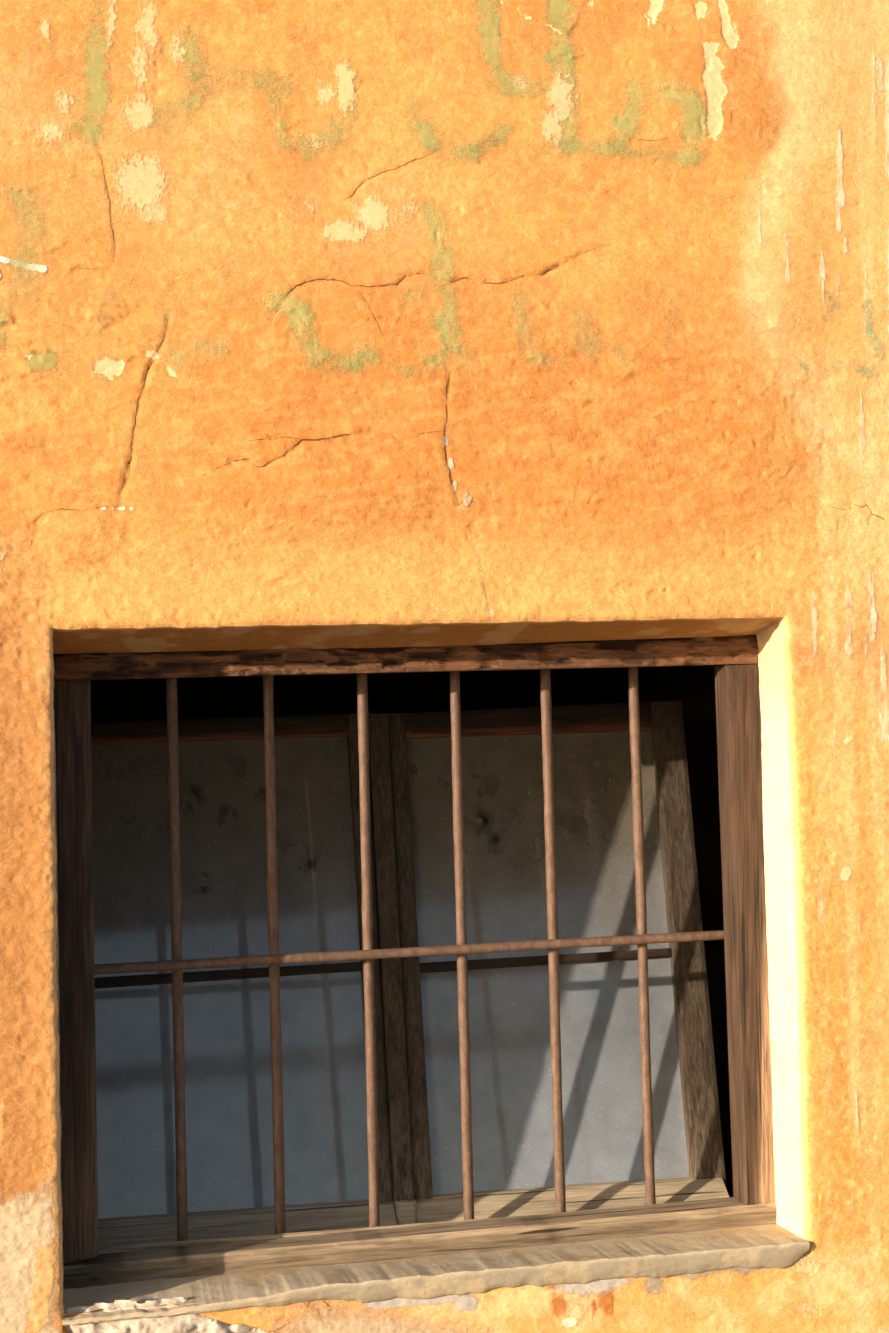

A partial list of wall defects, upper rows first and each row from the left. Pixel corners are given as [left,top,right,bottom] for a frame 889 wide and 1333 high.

peeling [644,0,664,27]
peeling [695,0,739,141]
crack [271,244,610,334]
crack [31,313,172,543]
crack [200,434,351,477]
crack [383,372,475,508]
peeling [0,1177,460,1333]